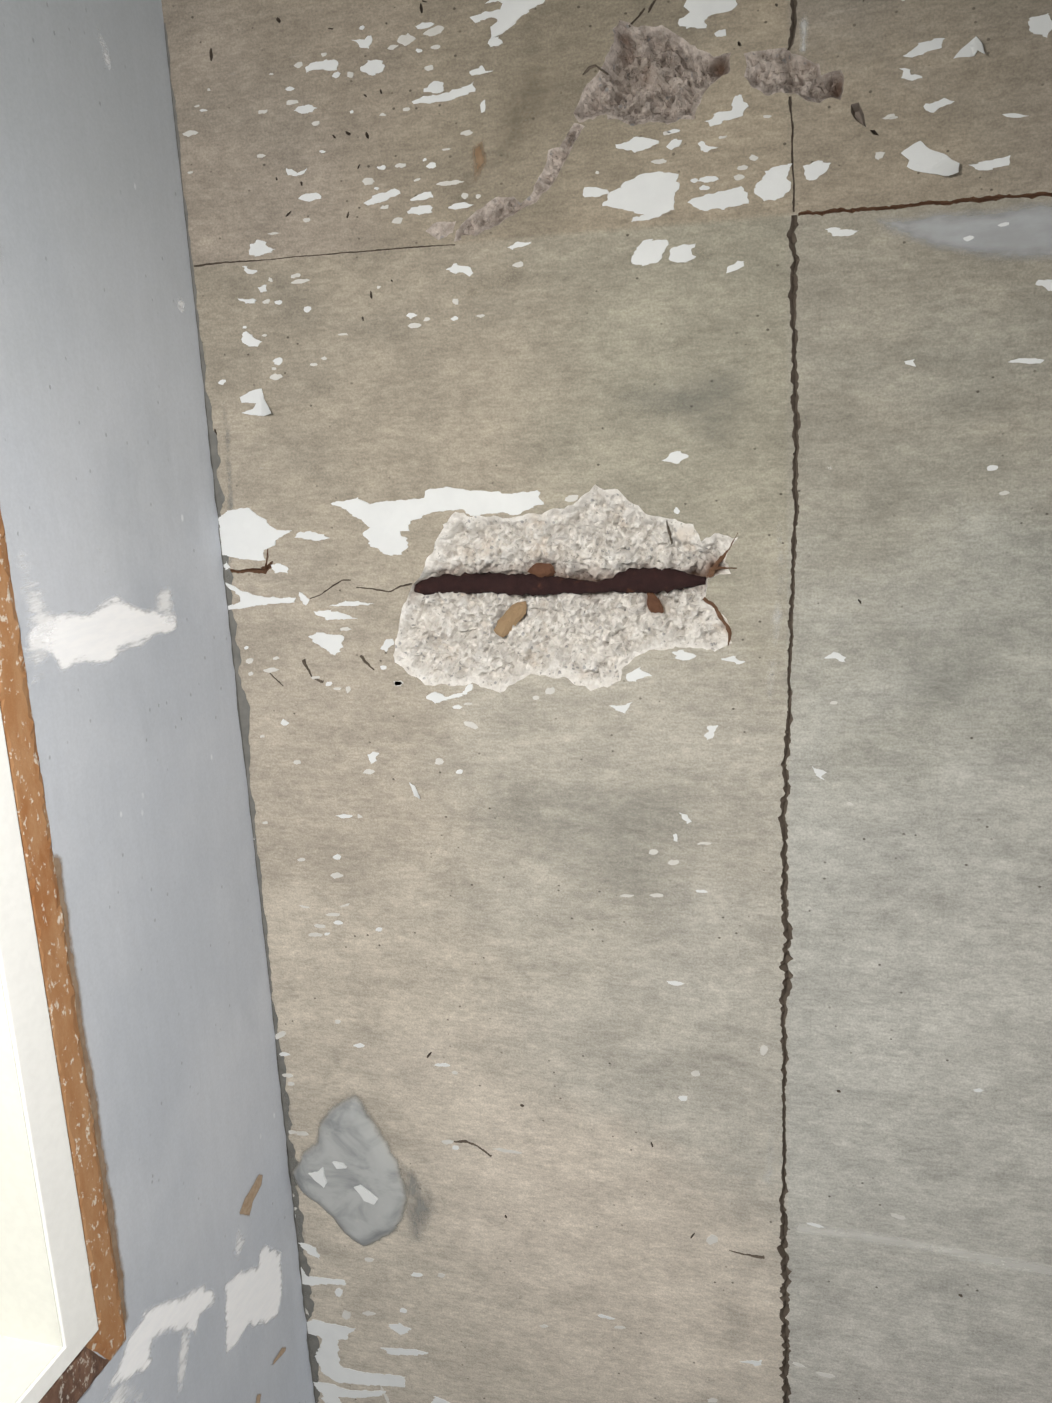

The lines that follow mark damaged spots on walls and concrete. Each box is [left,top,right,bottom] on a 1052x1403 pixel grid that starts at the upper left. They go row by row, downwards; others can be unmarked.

crack [787,0,798,51]
peeling [294,0,492,113]
peeling [899,36,985,81]
spalling [357,0,898,242]
peeling [923,98,954,113]
peeling [875,141,1010,176]
spalling [331,485,745,729]
peeling [704,725,718,740]
crack [729,96,801,1403]